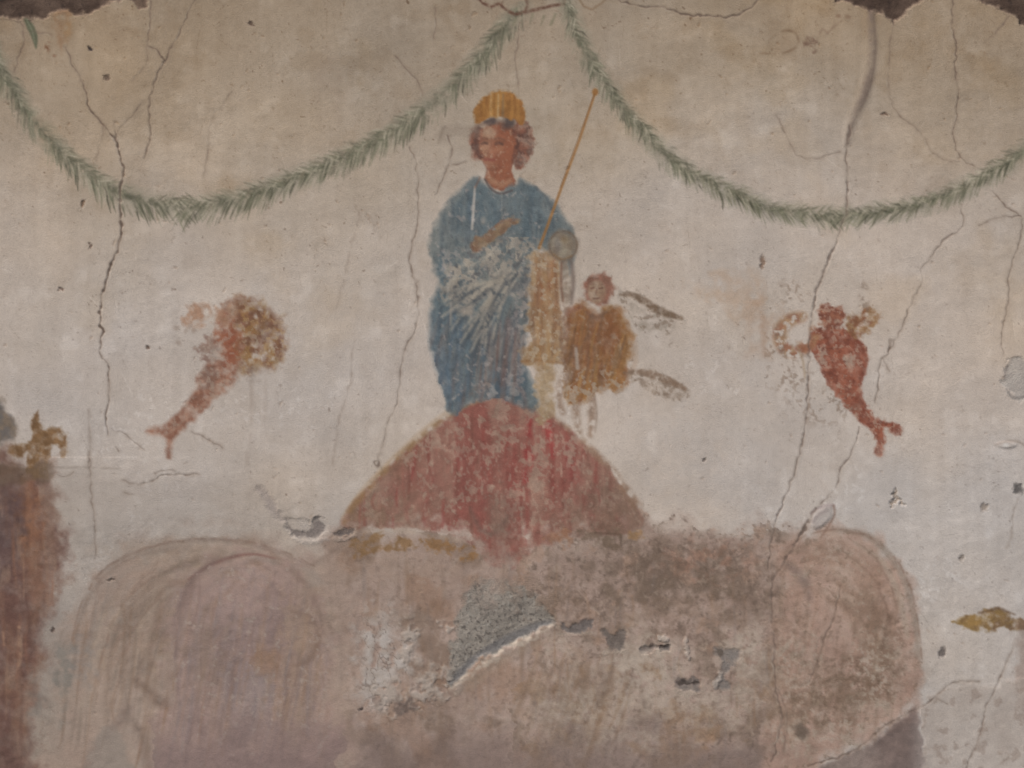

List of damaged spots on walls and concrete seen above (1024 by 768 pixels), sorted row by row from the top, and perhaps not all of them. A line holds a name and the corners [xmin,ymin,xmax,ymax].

spalling [0,0,150,24]
spalling [833,0,930,26]
spalling [973,0,1024,28]
crack [57,0,202,562]
crack [372,134,468,473]
crack [189,429,226,451]
crack [765,112,1024,768]
spalling [255,485,358,547]
spalling [343,571,691,729]
spalling [674,645,743,700]